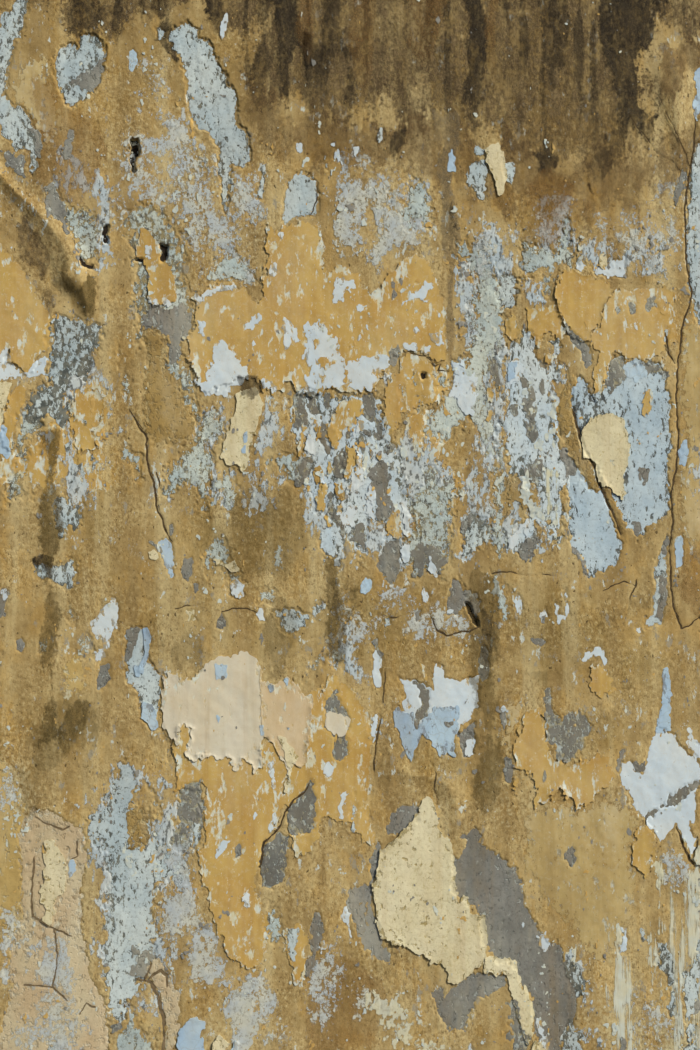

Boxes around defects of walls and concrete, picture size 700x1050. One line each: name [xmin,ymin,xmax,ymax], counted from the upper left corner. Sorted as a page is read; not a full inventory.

peeling [0,0,45,178]
peeling [55,34,107,107]
damp [28,0,188,62]
peeling [157,13,250,210]
damp [205,0,700,252]
peeling [692,67,700,121]
crack [126,400,173,542]
peeling [0,129,700,763]
crack [628,94,700,629]
peeling [616,667,700,854]
peeling [0,760,206,1050]
peeling [341,805,419,962]